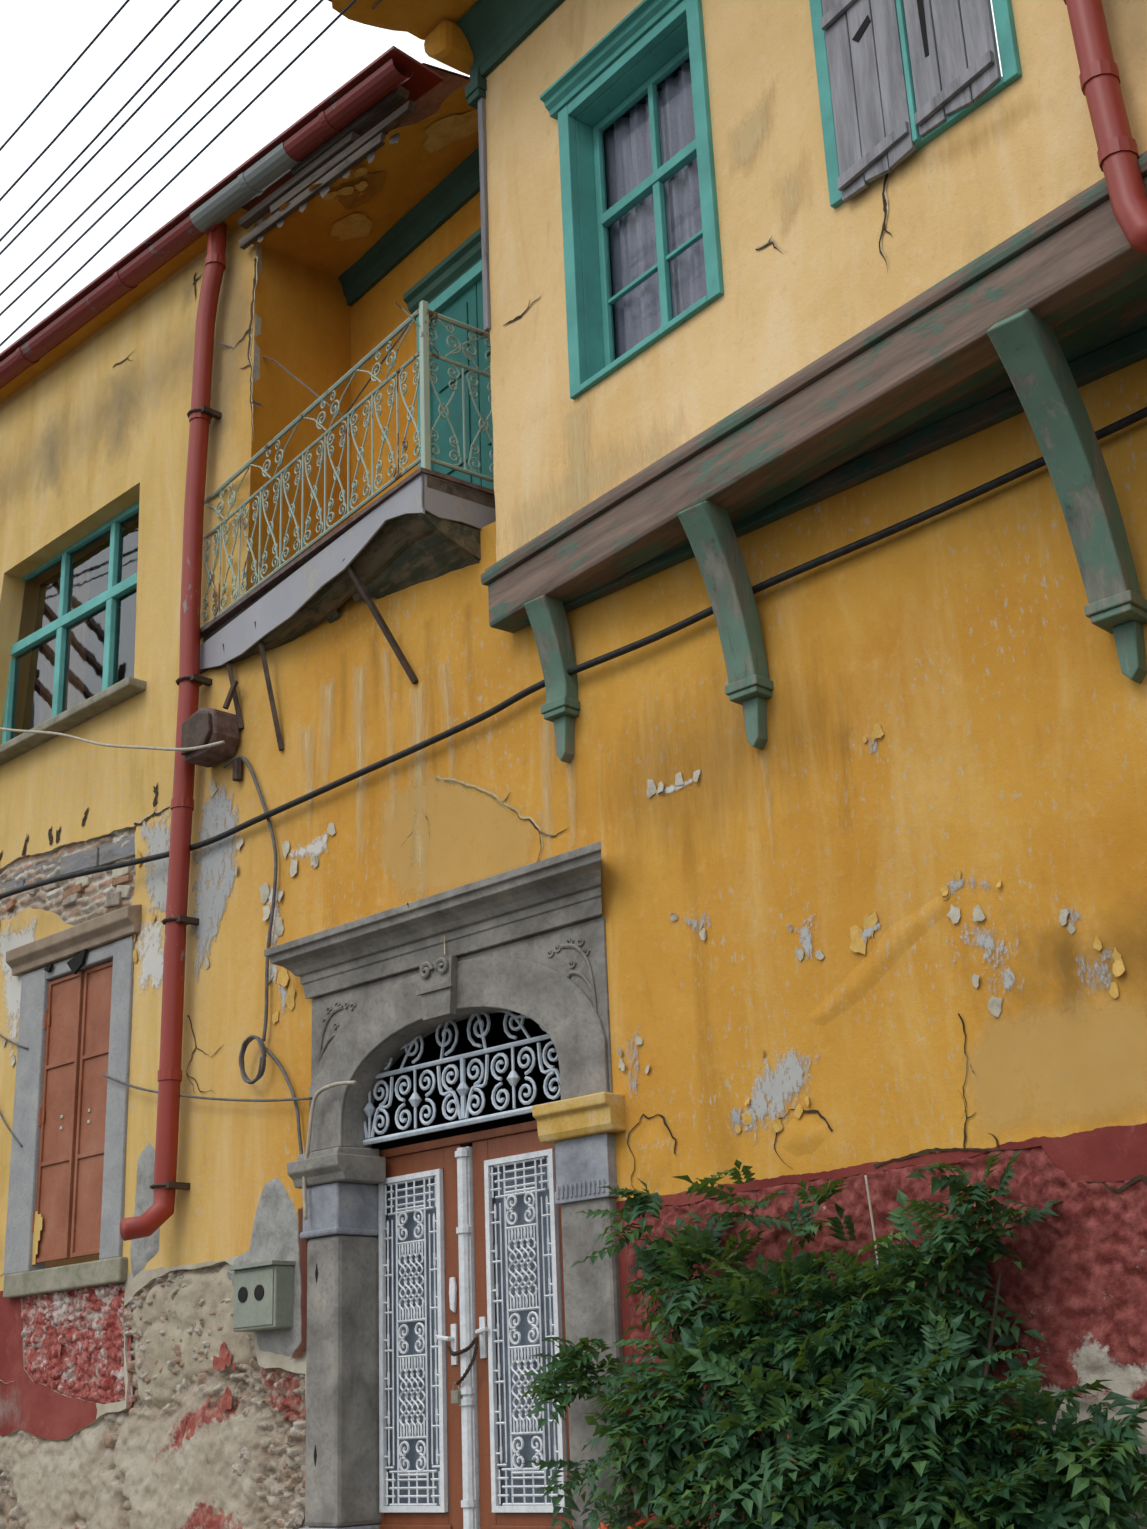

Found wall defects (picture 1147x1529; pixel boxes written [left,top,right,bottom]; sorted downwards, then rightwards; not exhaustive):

crack [879,173,892,273]
crack [232,256,264,442]
spalling [0,811,170,1066]
peeling [192,779,244,980]
crack [402,764,568,908]
peeling [646,769,701,799]
peeling [940,870,1024,1017]
peeling [1076,936,1125,999]
peeling [731,1048,818,1141]
crack [874,1013,1042,1168]
spalling [0,1262,307,1529]
spalling [627,1146,1147,1529]